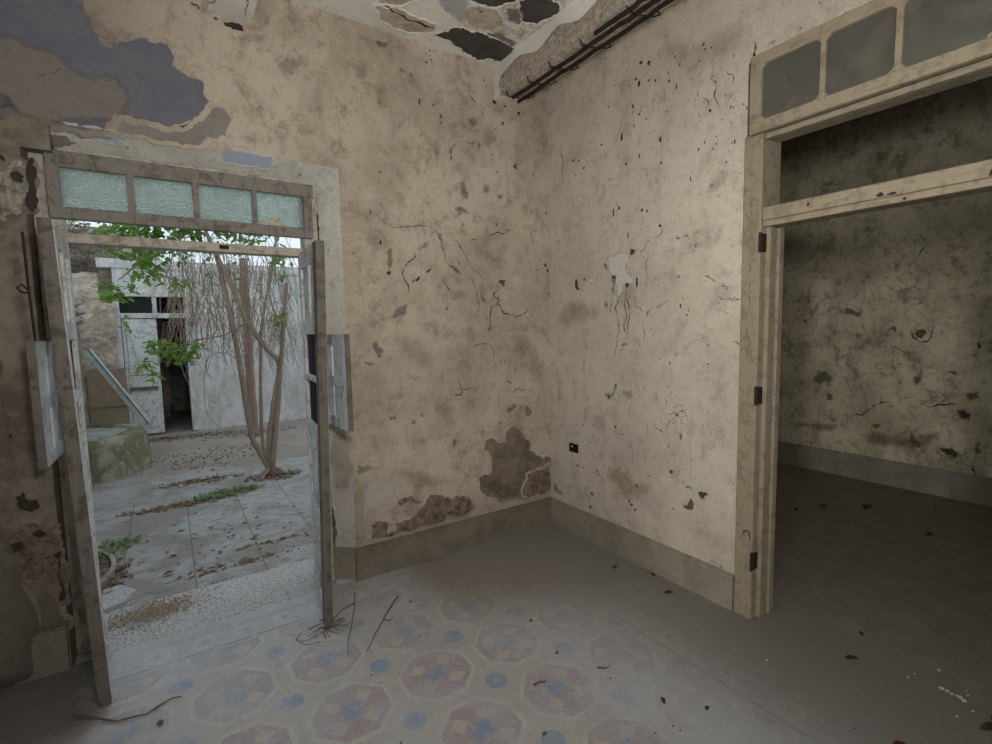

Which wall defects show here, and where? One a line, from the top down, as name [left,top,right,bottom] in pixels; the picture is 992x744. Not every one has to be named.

peeling [0,0,277,172]
spalling [366,0,675,115]
spalling [0,150,40,234]
crack [370,212,529,393]
crack [610,258,649,351]
spalling [368,491,476,543]
spalling [521,461,552,499]